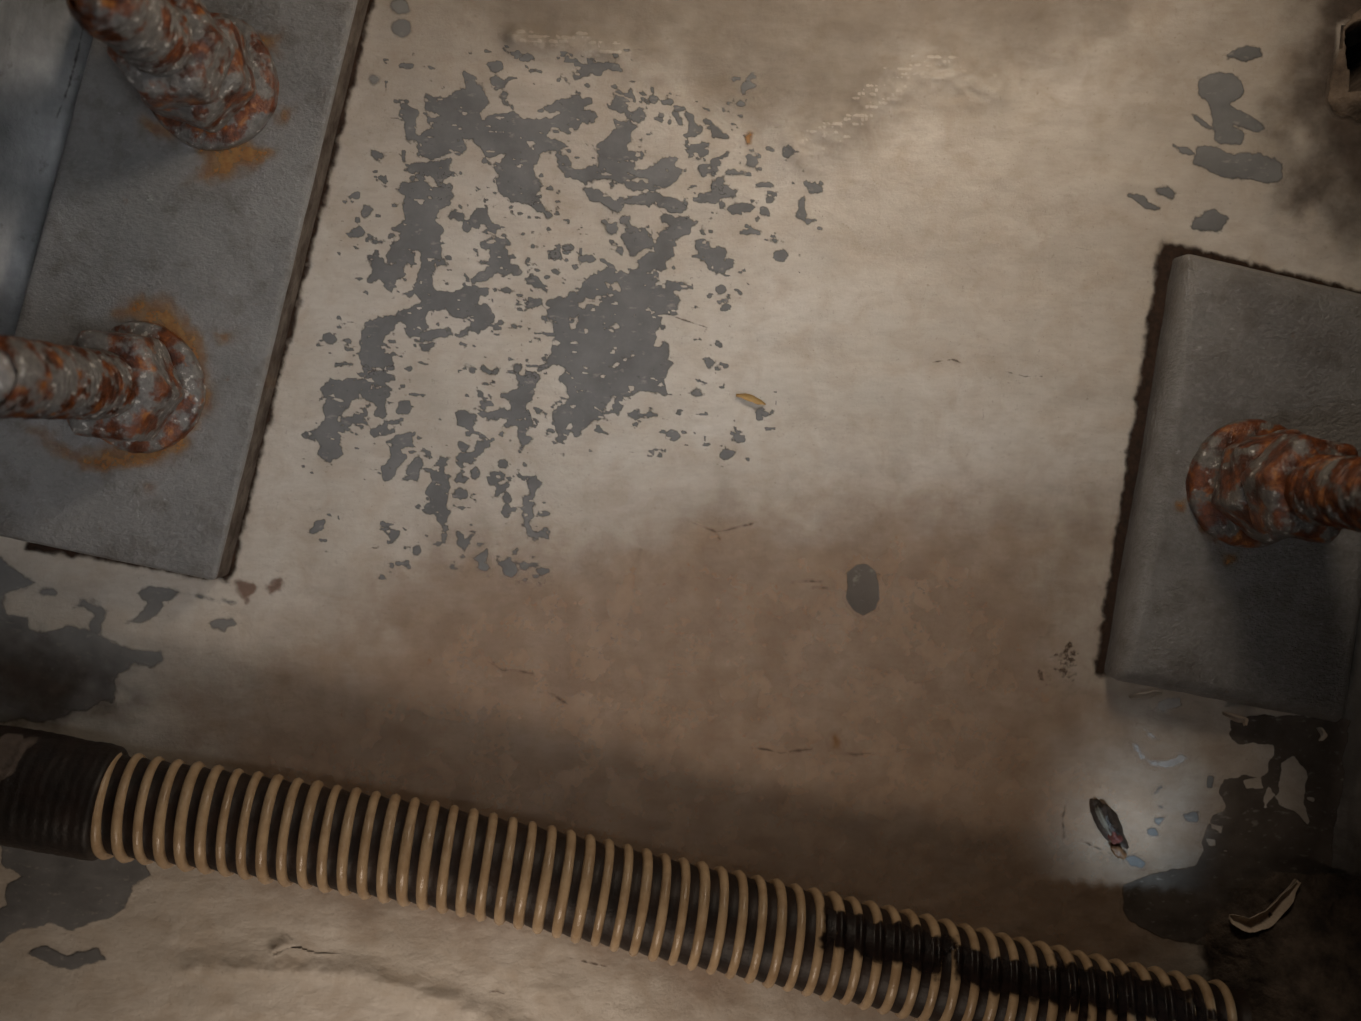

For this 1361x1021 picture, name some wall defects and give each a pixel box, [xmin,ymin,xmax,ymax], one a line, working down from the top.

peeling [1173,46,1283,183]
hole [1327,7,1361,120]
peeling [792,171,823,230]
peeling [1191,209,1229,232]
corrosion [25,0,375,597]
peeling [301,45,799,584]
corrosion [1094,244,1361,676]
peeling [0,557,163,722]
peeling [131,586,178,623]
peeling [29,946,106,970]
peeling [0,846,150,942]
peeling [1122,714,1351,944]